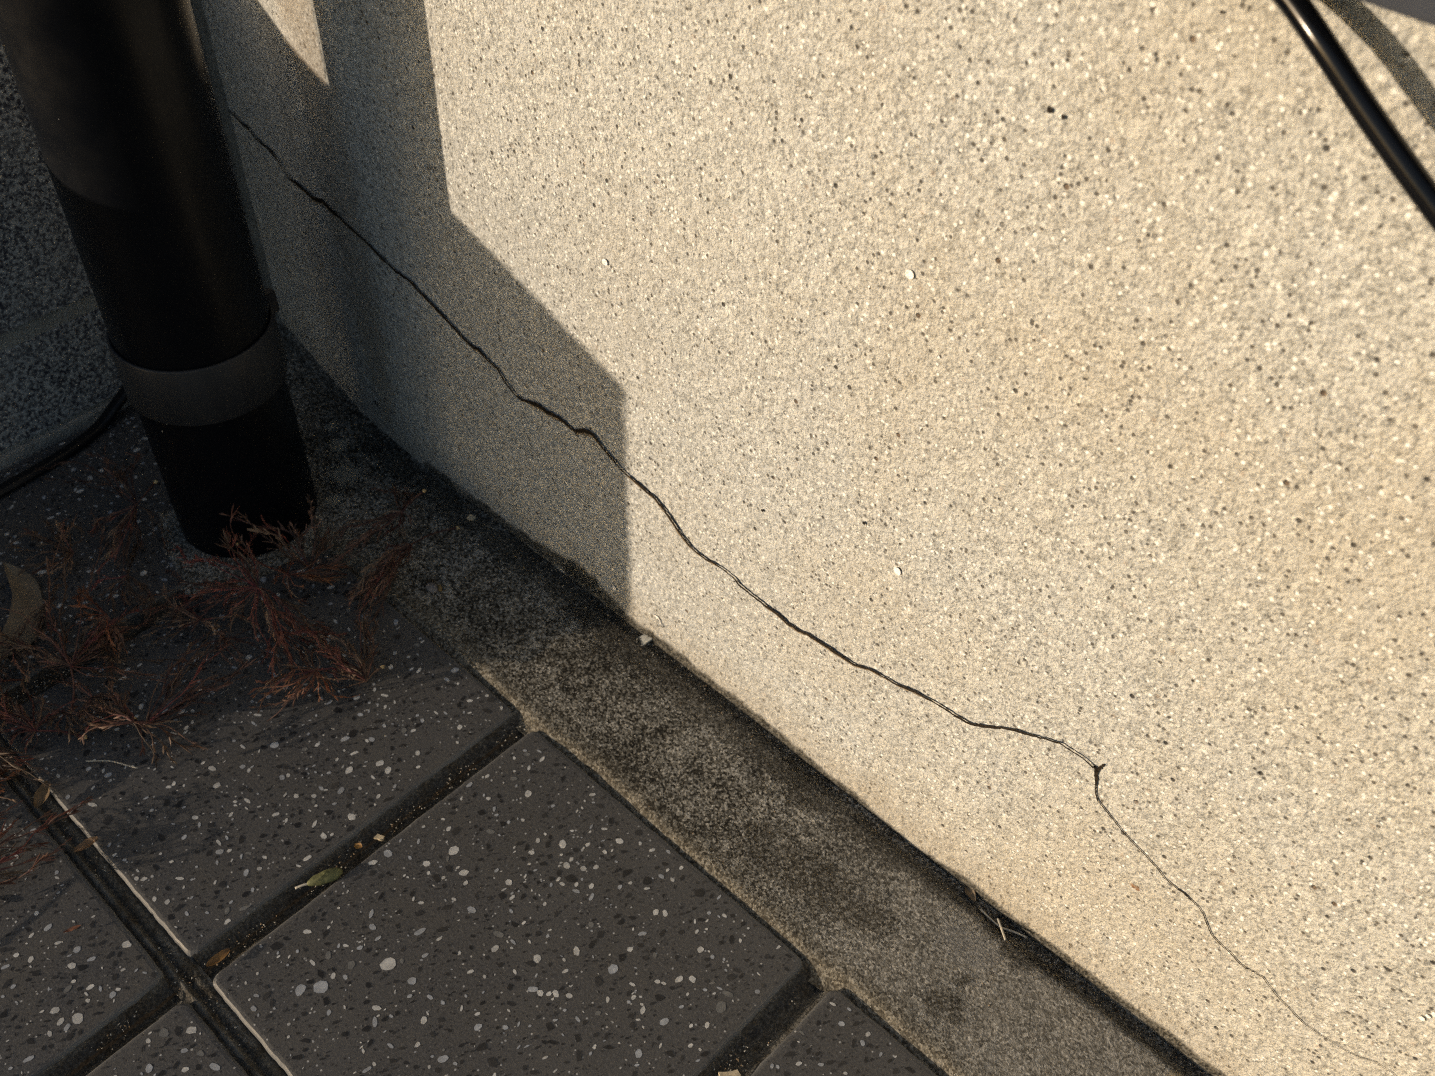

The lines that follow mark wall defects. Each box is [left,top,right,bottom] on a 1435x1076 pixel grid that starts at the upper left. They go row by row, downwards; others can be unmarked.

crack [229,110,1395,1076]